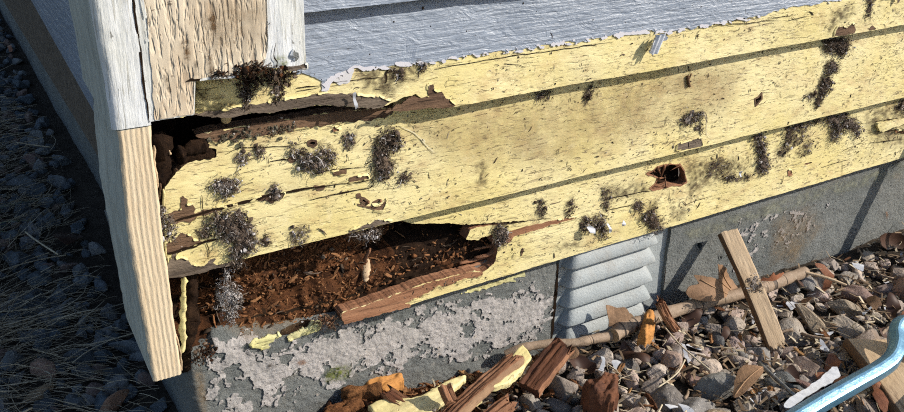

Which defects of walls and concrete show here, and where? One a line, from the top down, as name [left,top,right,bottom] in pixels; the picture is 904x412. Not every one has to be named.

crack [133,0,150,122]
damp [870,109,904,142]
peeling [167,196,238,278]
peeling [250,191,286,204]
damp [689,160,742,194]
peeling [205,272,554,412]